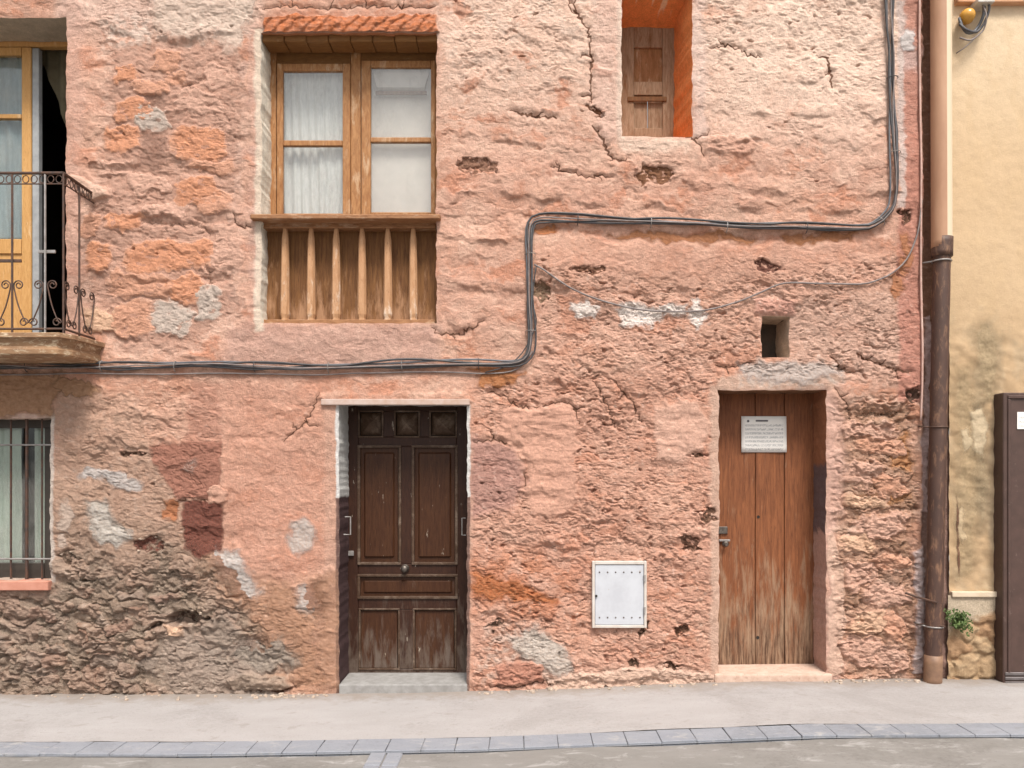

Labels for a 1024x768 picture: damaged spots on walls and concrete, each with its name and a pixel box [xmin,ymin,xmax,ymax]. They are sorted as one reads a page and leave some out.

crack [819,56,833,88]
crack [550,0,627,180]
spalling [456,157,498,174]
spalling [634,164,674,187]
flaking render [75,48,245,340]
spalling [754,255,781,274]
crack [284,392,320,441]
spalling [679,535,702,551]
spalling [0,536,246,695]